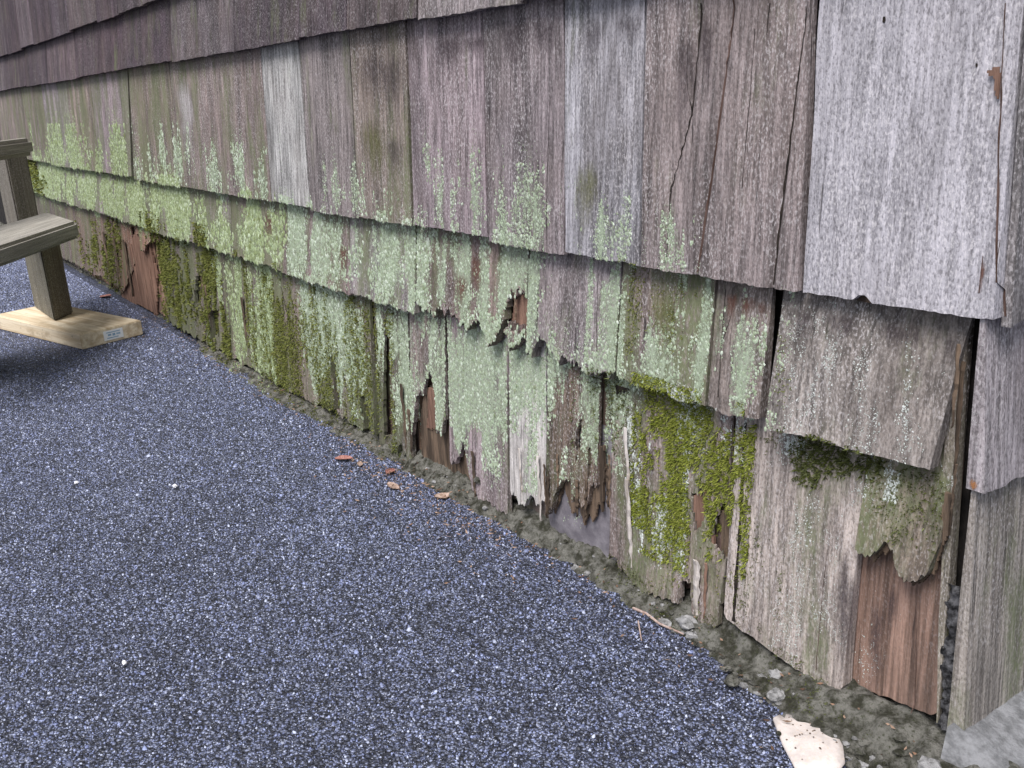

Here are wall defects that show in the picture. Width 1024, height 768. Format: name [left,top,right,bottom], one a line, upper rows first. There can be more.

crack [664,3,702,264]
crack [697,0,770,272]
crack [773,12,807,285]
water stain [456,260,481,300]
spalling [422,467,488,513]